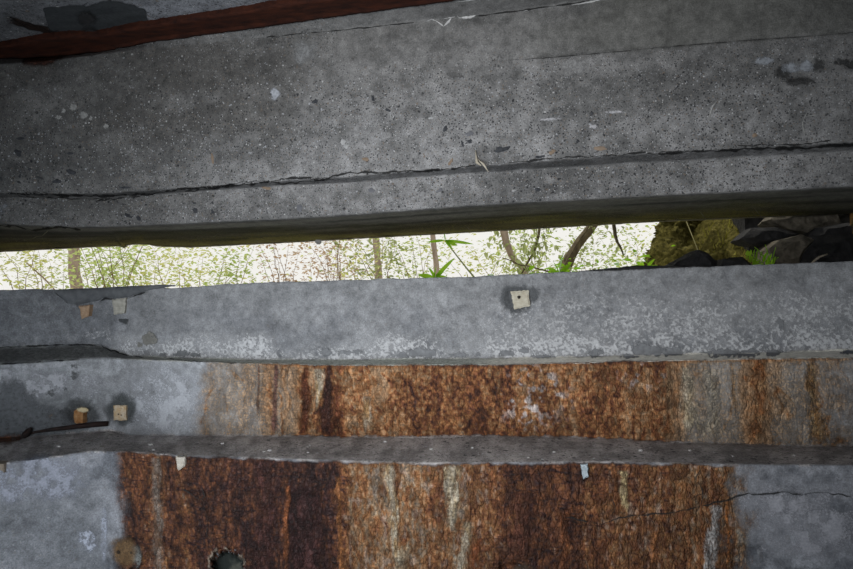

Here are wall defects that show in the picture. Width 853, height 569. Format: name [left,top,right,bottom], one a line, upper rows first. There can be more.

rust [10,17,58,33]
crack [509,140,853,163]
crack [8,165,474,202]
rust [199,358,853,447]
rust [117,451,749,569]
crack [565,467,851,525]